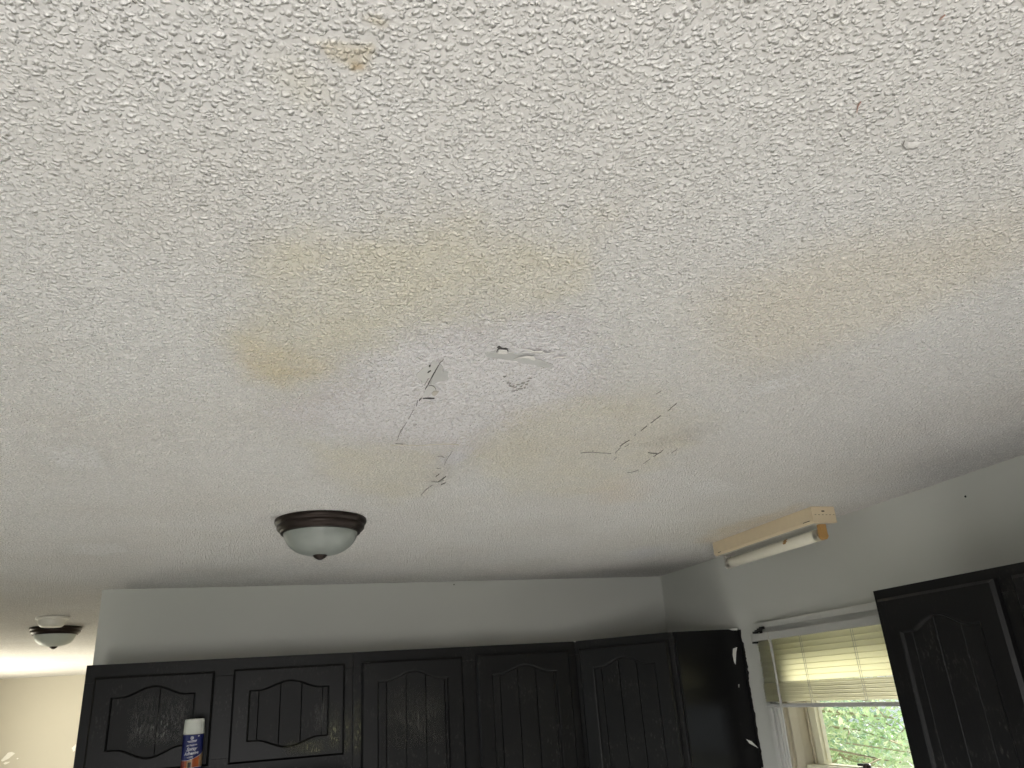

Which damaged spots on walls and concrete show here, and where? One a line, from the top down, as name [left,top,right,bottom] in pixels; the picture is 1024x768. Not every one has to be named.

peeling [416,359,449,397]
peeling [485,346,568,368]
crack [391,397,459,446]
crack [582,391,678,473]